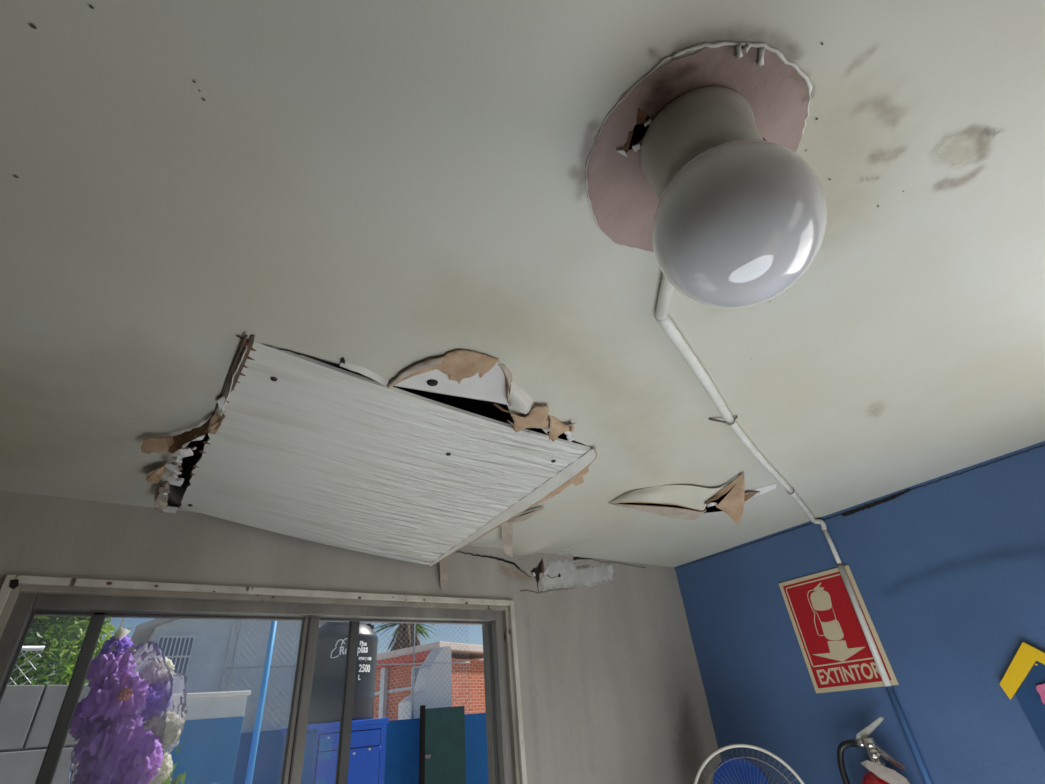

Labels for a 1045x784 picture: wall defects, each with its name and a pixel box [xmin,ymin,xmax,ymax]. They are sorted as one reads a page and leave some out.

flaking render [585,41,813,252]
peeling [429,449,596,590]
flaking render [531,551,614,591]